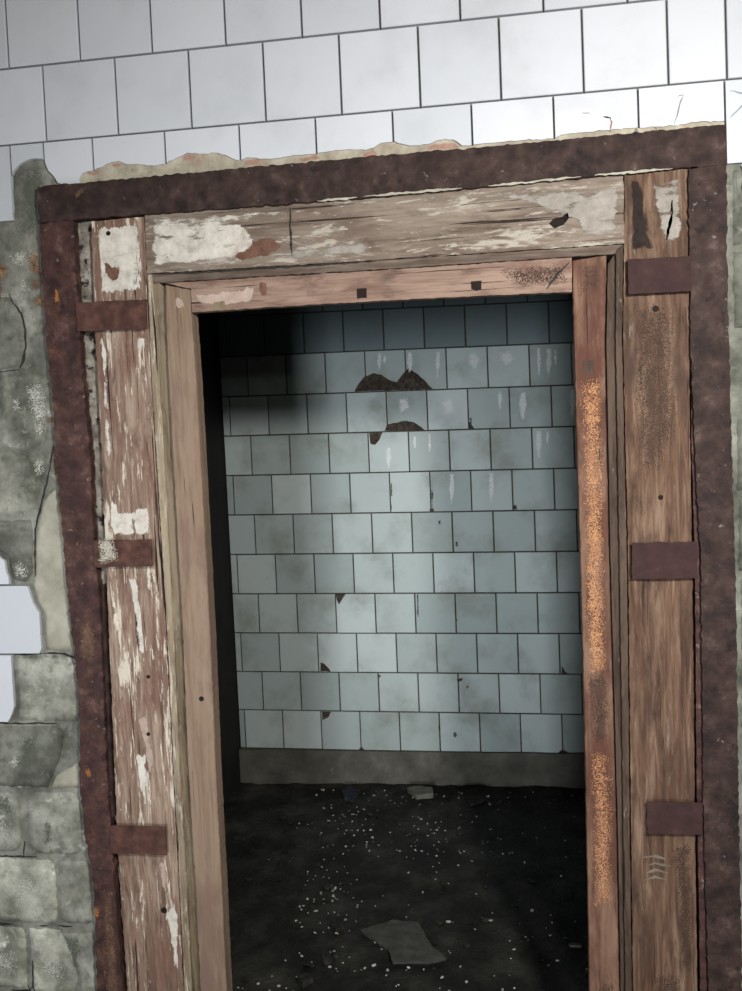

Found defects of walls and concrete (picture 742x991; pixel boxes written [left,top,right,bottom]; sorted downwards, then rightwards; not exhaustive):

spalling [80,122,725,183]
peeling [98,224,142,293]
peeling [152,213,259,265]
spalling [355,369,432,392]
spalling [369,421,424,445]
spalling [0,160,97,991]
spalling [726,164,742,987]
peeling [129,578,144,653]
peeling [136,716,154,804]
peeling [159,862,167,891]
peeling [166,904,178,969]